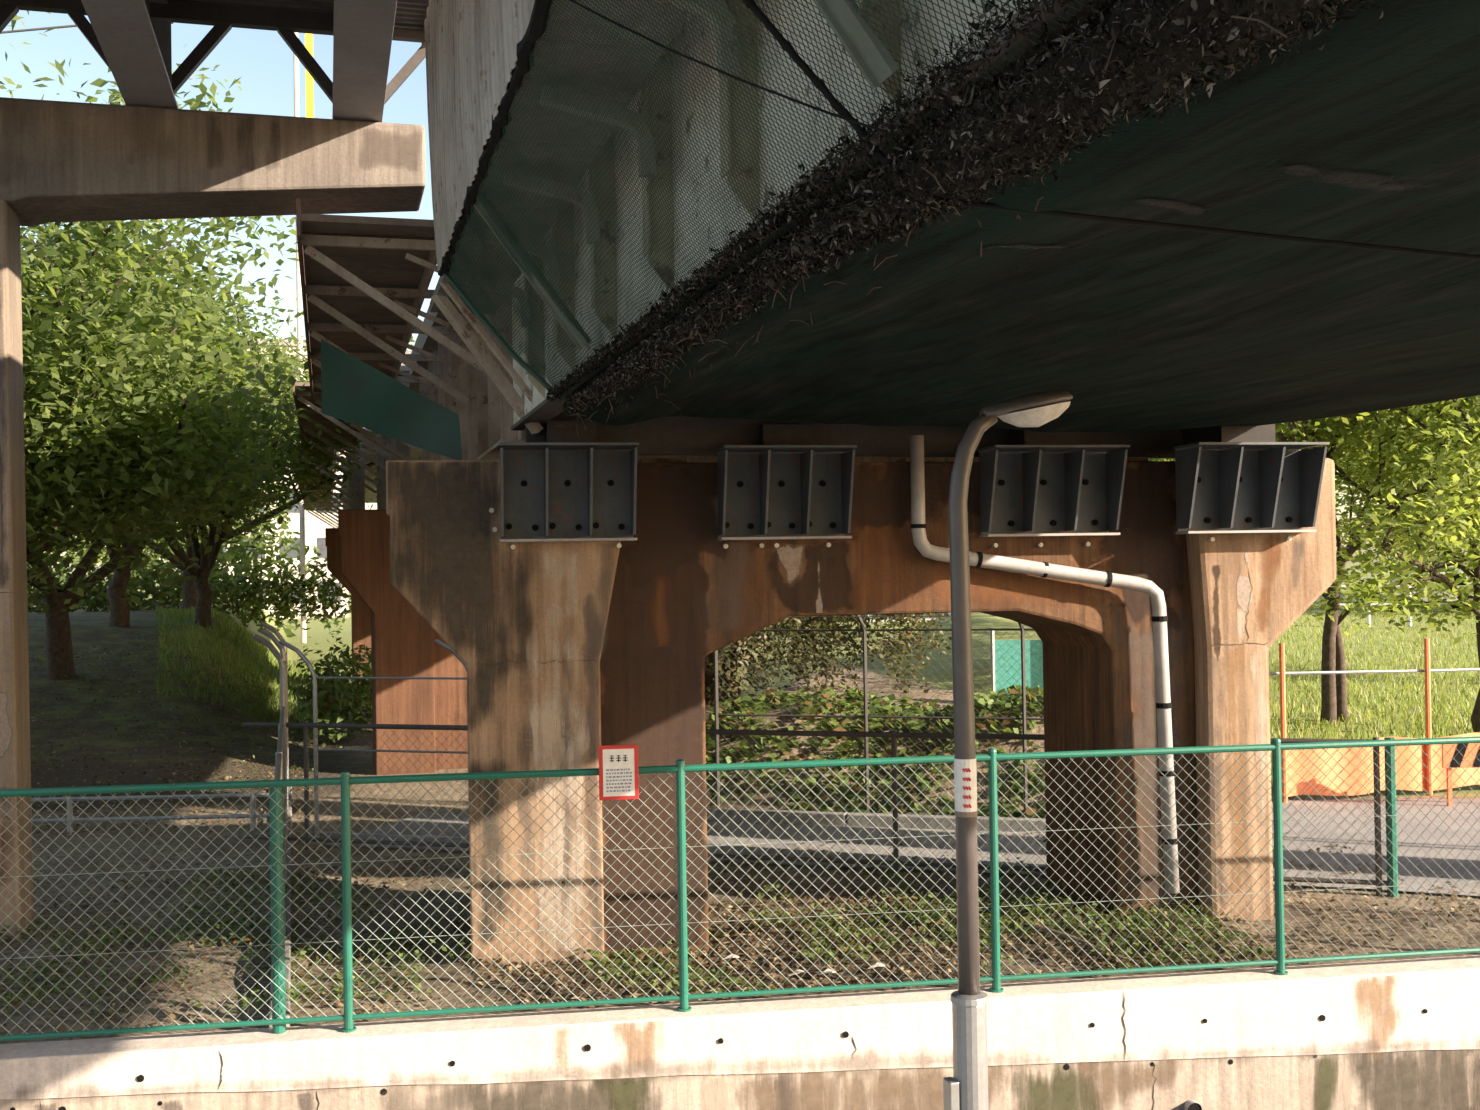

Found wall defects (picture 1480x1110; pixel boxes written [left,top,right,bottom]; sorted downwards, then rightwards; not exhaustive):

crack [0,448,11,593]
damp [1213,565,1221,657]
spalling [1237,553,1253,635]
crack [1122,997,1157,1110]
damp [1315,978,1480,1110]